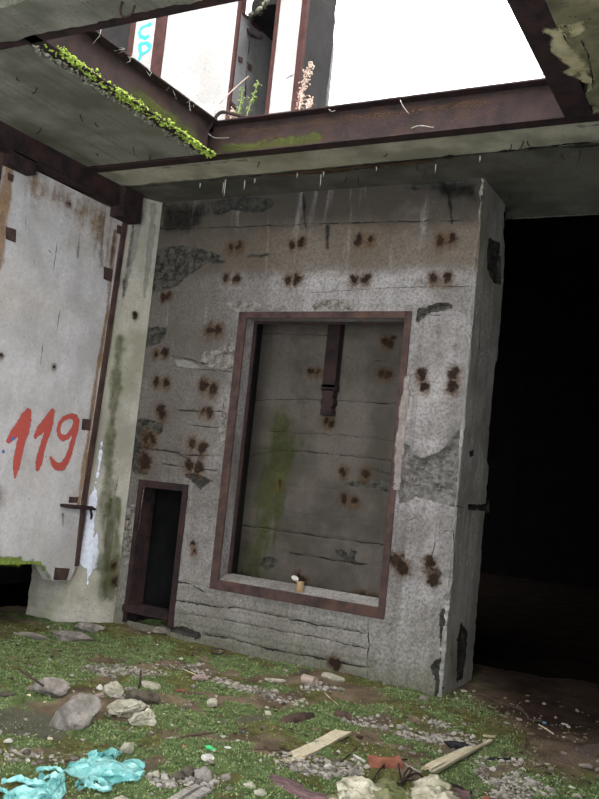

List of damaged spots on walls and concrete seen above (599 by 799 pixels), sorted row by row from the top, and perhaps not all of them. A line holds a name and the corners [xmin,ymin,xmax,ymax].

peeling [545,22,593,84]
rust [0,167,12,268]
spalling [152,246,226,294]
spalling [416,302,453,322]
rust [199,378,218,395]
rust [416,368,430,393]
rust [447,366,459,394]
rust [185,438,209,474]
spalling [343,429,490,514]
rust [390,554,409,575]
rust [425,555,442,587]
spalling [430,608,468,696]